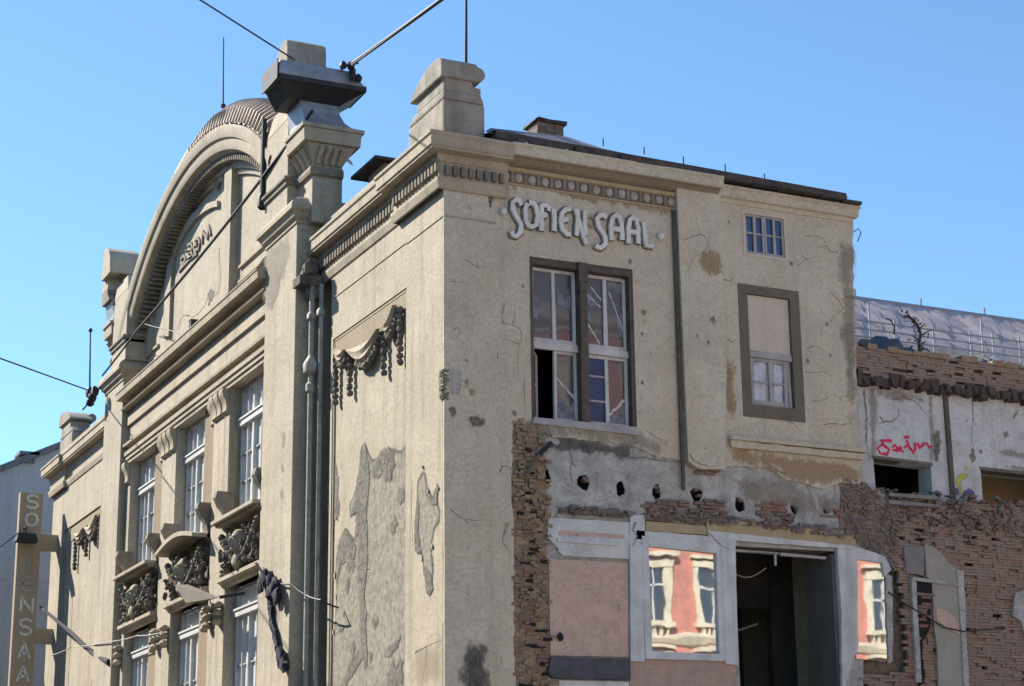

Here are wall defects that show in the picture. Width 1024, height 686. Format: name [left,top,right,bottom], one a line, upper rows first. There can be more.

leakage [840,245,940,461]
flaking render [327,443,440,686]
leakage [459,645,490,686]
spalling [511,410,1024,686]